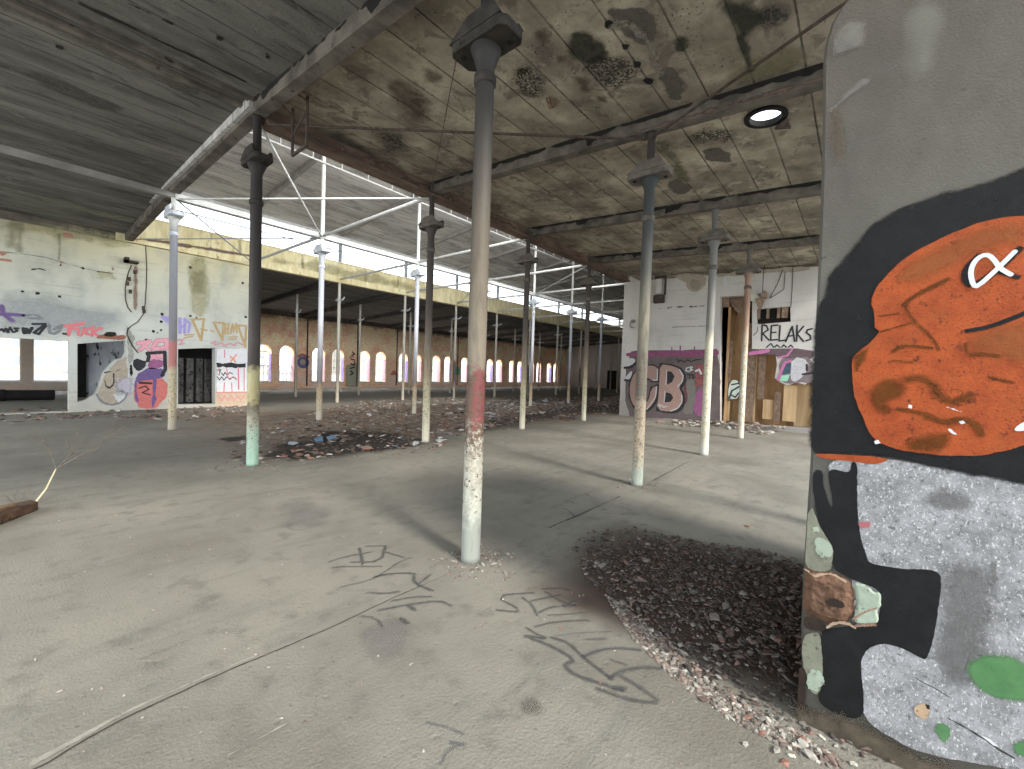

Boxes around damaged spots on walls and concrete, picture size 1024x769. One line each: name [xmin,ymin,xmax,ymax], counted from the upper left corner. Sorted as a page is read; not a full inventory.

leakage [515,66,545,96]
leakage [577,57,636,102]
leakage [689,130,733,162]